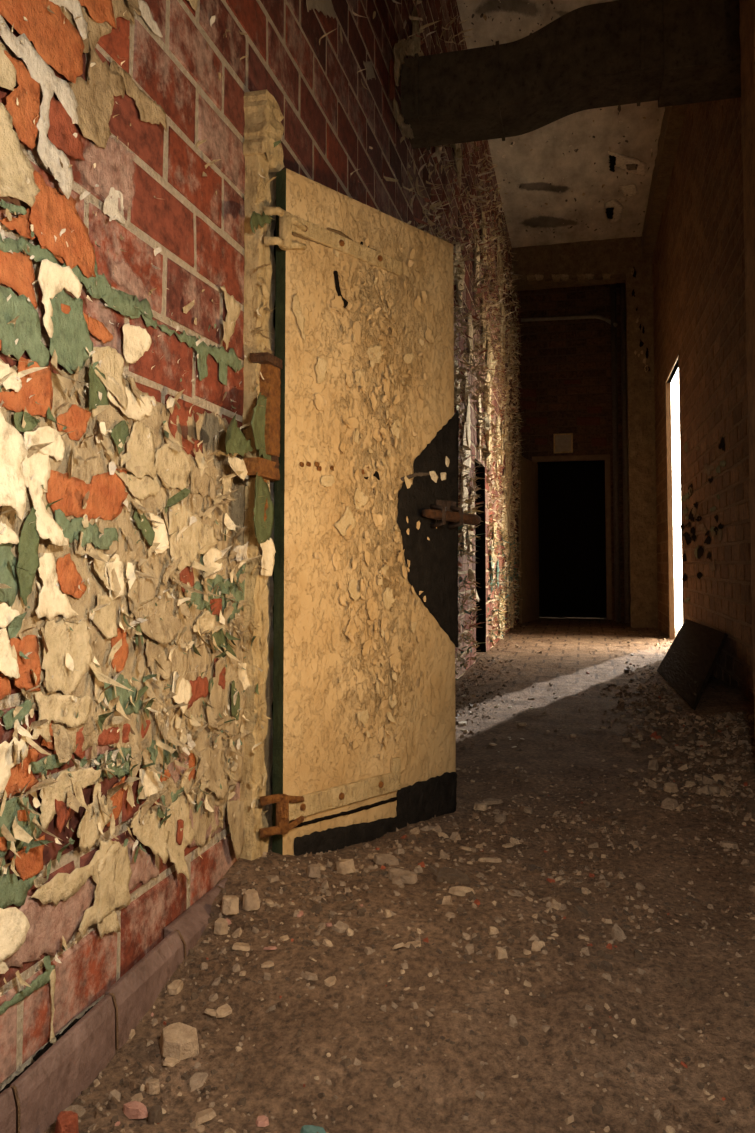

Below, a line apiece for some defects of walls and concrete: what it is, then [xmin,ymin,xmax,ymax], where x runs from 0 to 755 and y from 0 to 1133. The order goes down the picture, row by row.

spalling [389,0,474,145]
peeling [326,140,526,760]